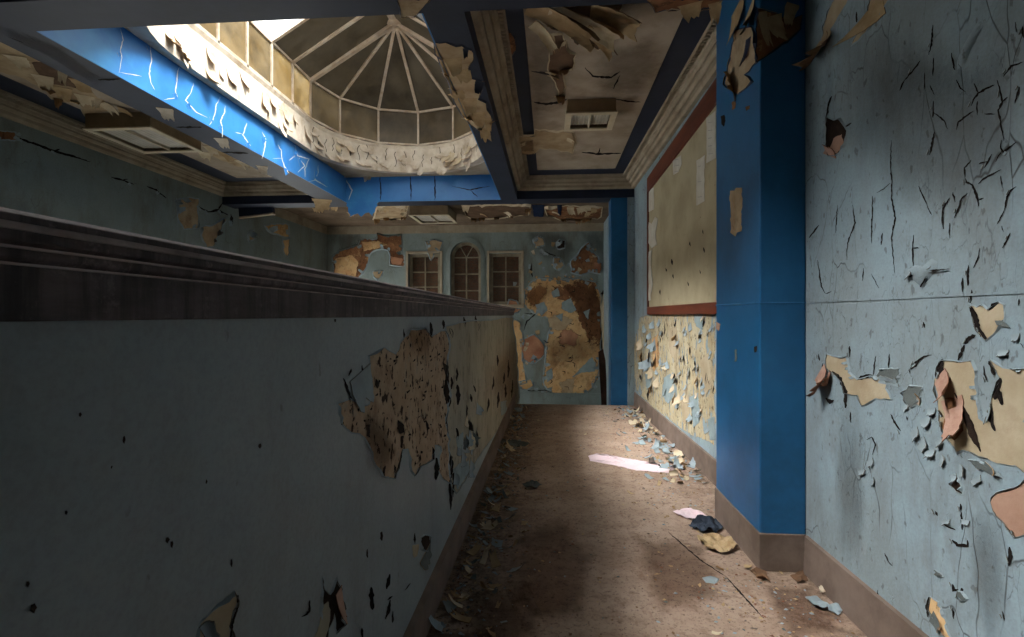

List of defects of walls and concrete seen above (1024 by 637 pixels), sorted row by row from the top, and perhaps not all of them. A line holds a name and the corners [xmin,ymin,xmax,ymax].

peeling [0,42,133,117]
crack [98,32,353,198]
peeling [165,31,498,182]
peeling [312,198,409,281]
peeling [539,20,600,105]
peeling [729,188,743,237]
peeling [822,96,851,159]
crack [809,140,918,294]
crack [899,22,1024,303]
peeling [337,236,604,510]
peeling [634,314,721,445]
peeling [806,301,1024,538]